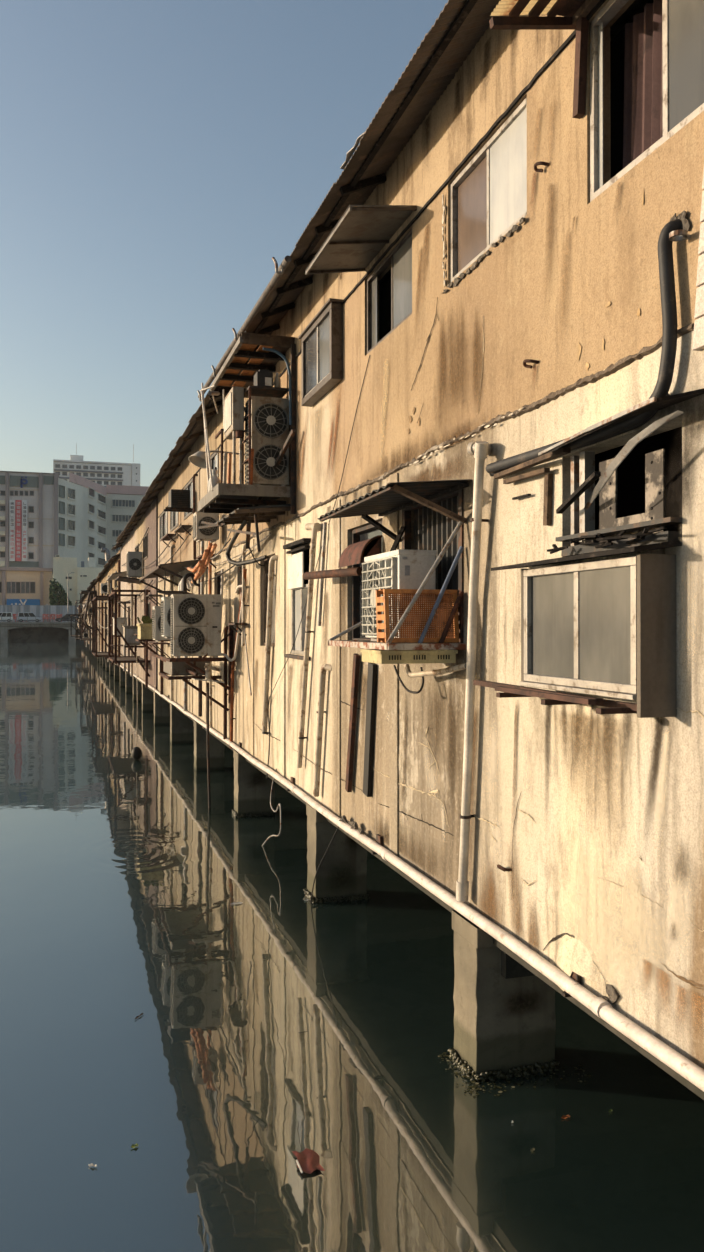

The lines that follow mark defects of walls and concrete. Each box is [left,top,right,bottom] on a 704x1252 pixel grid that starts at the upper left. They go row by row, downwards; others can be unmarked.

damp [439,326,481,407]
damp [431,696,455,777]
damp [545,704,629,763]
damp [650,717,668,791]
crack [598,856,704,932]
crack [661,963,704,989]